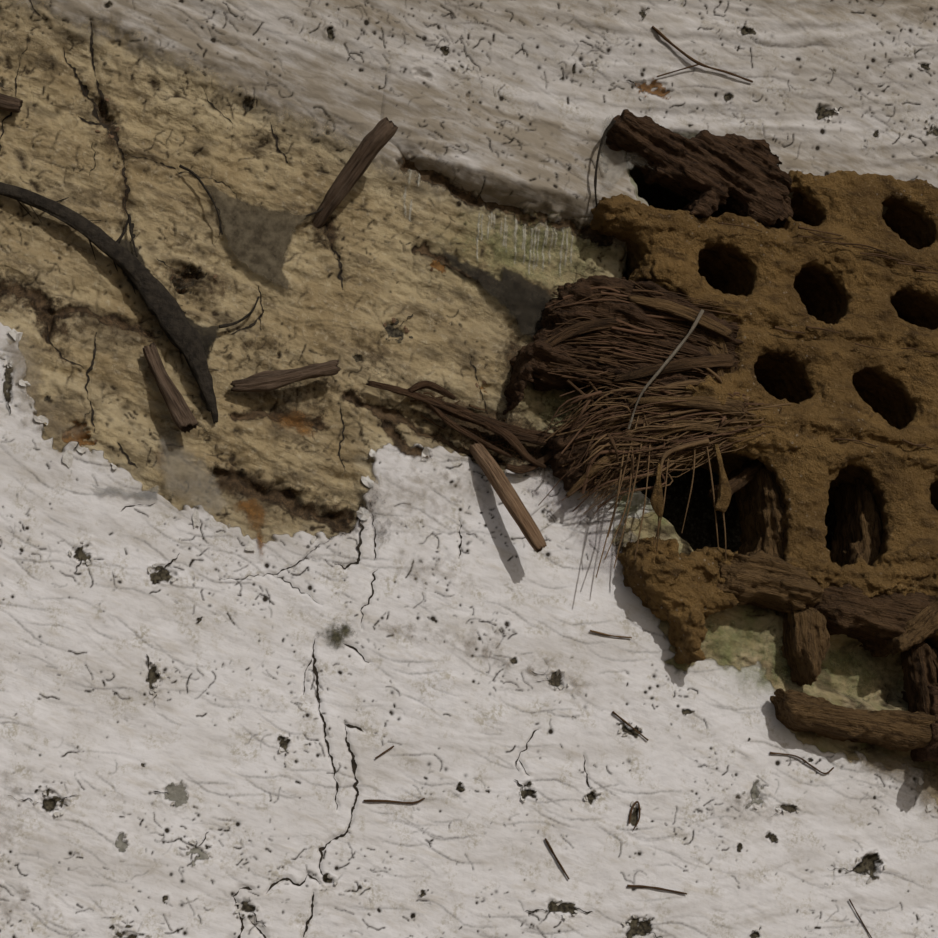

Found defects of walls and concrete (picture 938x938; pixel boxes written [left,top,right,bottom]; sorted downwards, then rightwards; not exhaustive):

crack [0,38,28,151]
crack [63,22,237,244]
crack [270,122,288,163]
peeling [0,0,625,551]
spalling [68,541,91,572]
spalling [148,553,180,584]
crack [221,538,330,602]
crack [335,505,378,663]
peeling [611,511,693,554]
spalling [146,654,162,703]
peeling [701,605,908,711]
crack [232,636,363,938]